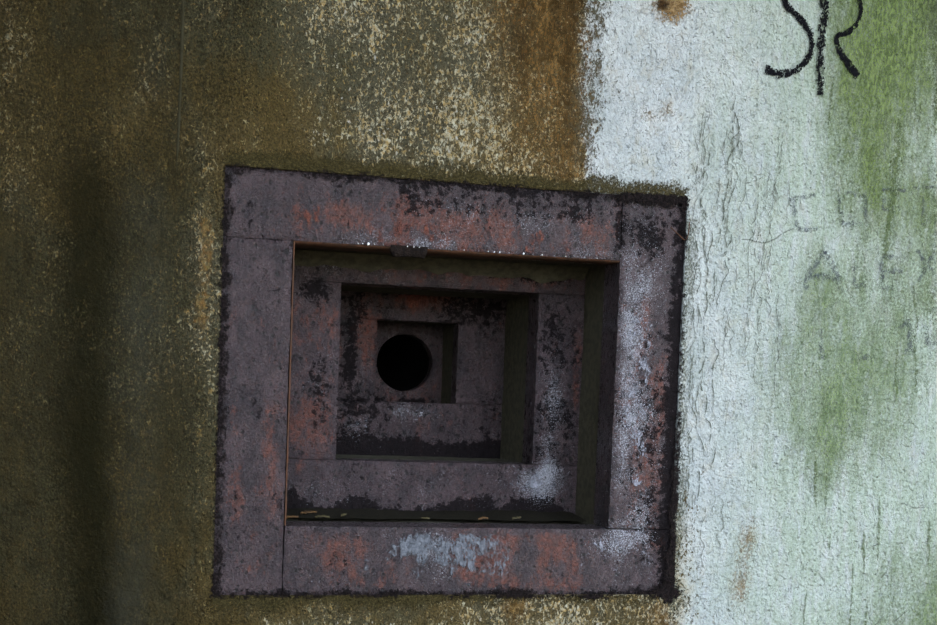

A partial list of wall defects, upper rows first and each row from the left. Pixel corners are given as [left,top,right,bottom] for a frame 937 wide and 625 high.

rust [652,0,695,25]
damp [0,0,215,625]
rust [284,241,391,526]
rust [426,249,620,266]
crack [679,98,792,575]